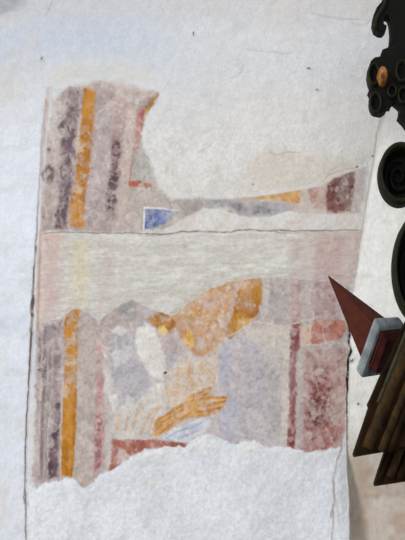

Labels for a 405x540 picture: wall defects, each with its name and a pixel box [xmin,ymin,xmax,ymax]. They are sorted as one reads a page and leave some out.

crack [22,88,384,540]